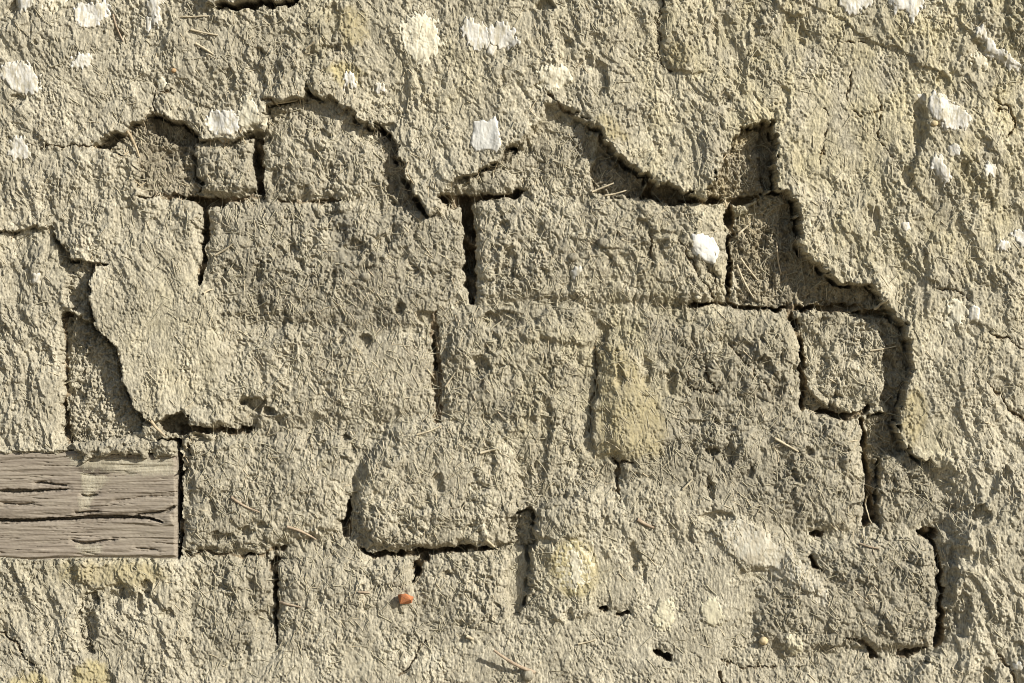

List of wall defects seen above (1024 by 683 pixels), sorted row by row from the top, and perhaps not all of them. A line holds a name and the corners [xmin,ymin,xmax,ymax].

spalling [100,92,268,199]
spalling [362,122,426,215]
peeling [470,116,519,165]
crack [438,189,525,305]
spalling [60,246,145,446]
spalling [590,121,913,527]
spalling [160,413,189,434]
crack [846,526,946,659]